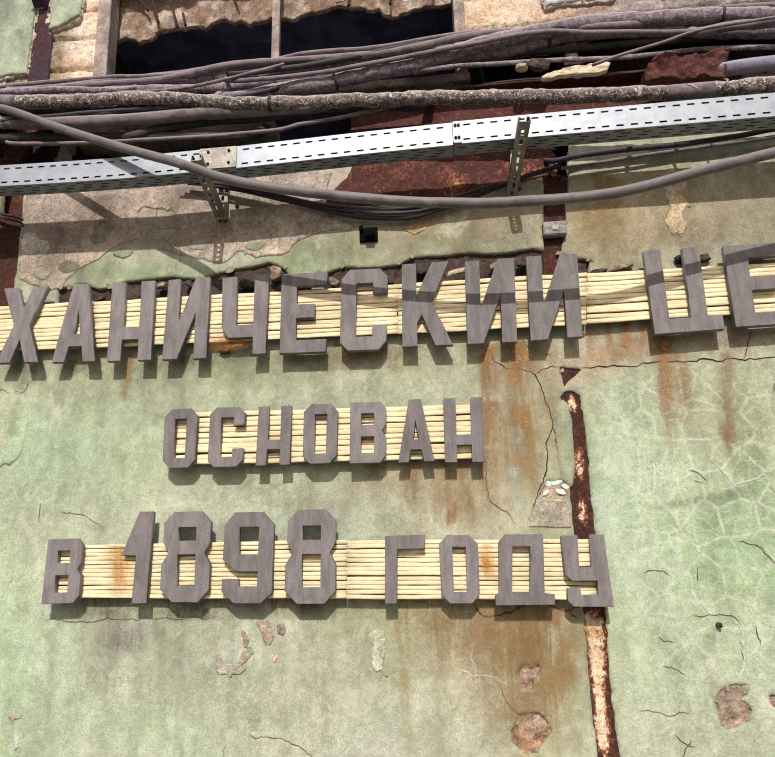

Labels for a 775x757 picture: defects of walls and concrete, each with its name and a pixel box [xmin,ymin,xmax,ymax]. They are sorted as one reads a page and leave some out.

peeling [250,172,332,189]
rust [334,148,558,198]
peeling [19,184,358,303]
spalling [381,250,543,290]
crack [582,331,772,368]
rust [481,345,494,484]
crack [485,339,557,521]
rust [508,341,535,454]
peeling [529,480,571,528]
crack [692,614,761,660]
spalling [715,684,751,729]
spalling [511,711,552,755]